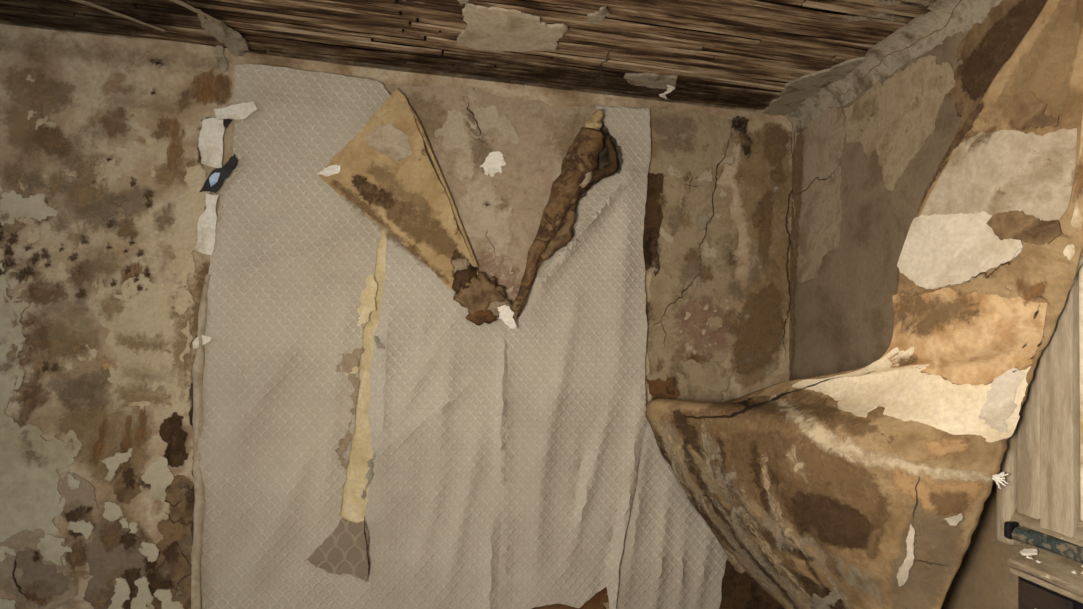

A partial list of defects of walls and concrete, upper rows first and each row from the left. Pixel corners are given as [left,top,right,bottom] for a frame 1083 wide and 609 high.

water stain [2,158,173,417]
peeling [0,173,198,609]
water stain [119,263,209,411]
peeling [317,165,340,177]
peeling [335,348,364,469]
peeling [357,274,385,349]
flaking render [366,83,595,305]
crack [649,121,735,350]
water stain [657,123,792,386]
water stain [655,410,882,609]
water stain [769,389,990,515]
water stain [893,292,979,336]